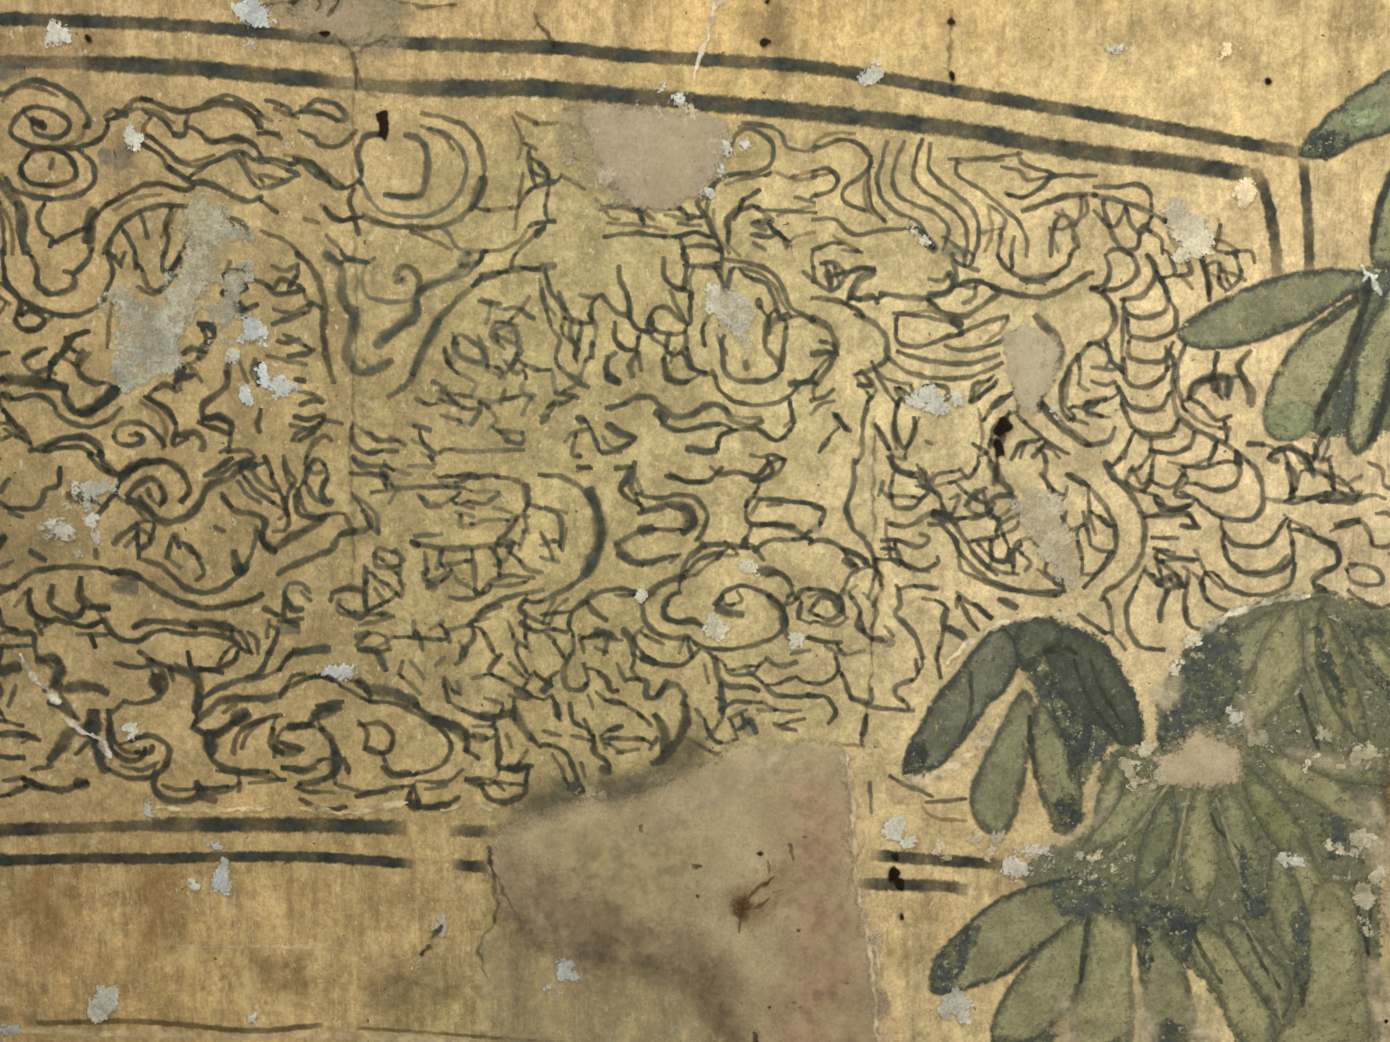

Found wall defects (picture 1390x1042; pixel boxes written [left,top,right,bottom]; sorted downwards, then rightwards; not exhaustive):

flaking render [231,0,411,53]
peeling [636,81,699,120]
peeling [700,133,751,202]
peeling [178,193,249,251]
peeling [207,256,301,406]
flaking render [1118,691,1274,797]
peeling [1297,726,1382,773]
flaking render [485,738,891,1042]